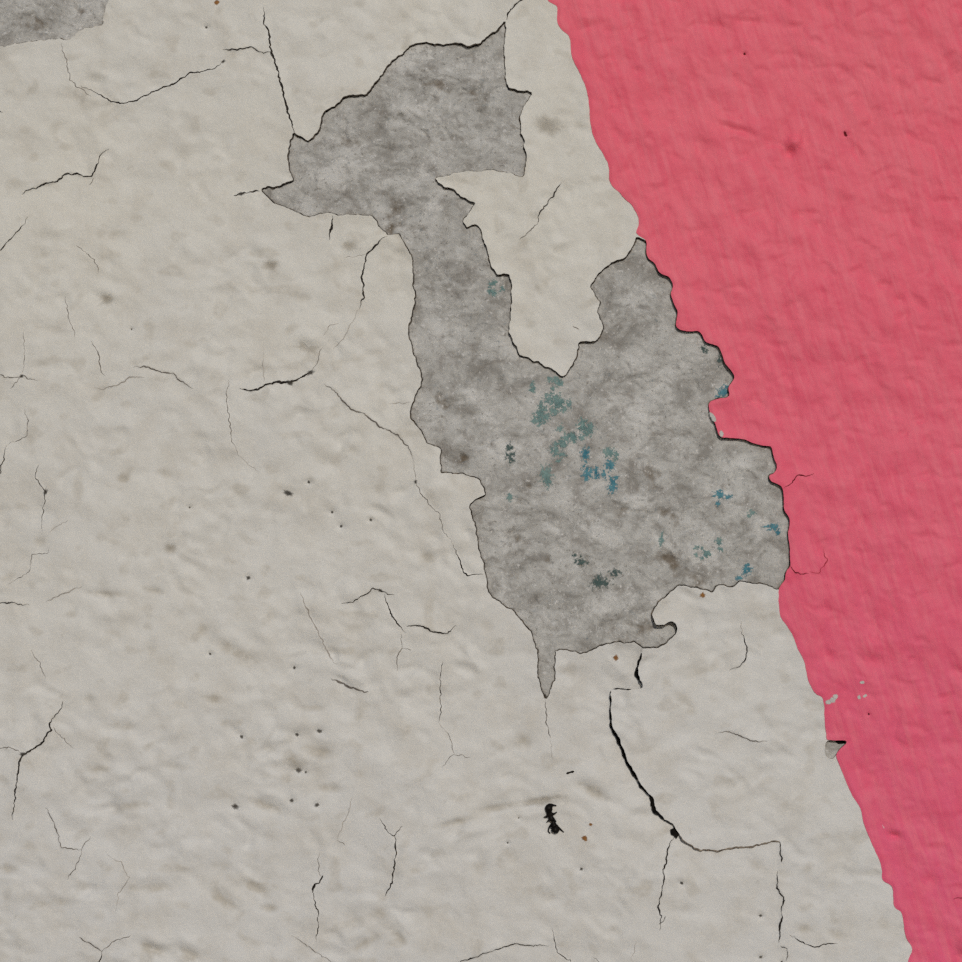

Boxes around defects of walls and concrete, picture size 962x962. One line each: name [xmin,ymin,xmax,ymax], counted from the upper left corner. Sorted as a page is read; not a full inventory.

peeling [0,0,109,47]
crack [61,7,294,130]
crack [23,150,106,194]
crack [226,237,479,576]
peeling [262,23,866,852]
crack [347,588,455,668]
crack [0,702,71,820]
crack [609,653,679,929]
crack [298,854,331,962]
crack [380,819,402,894]
crack [460,930,599,962]
crack [776,842,837,960]